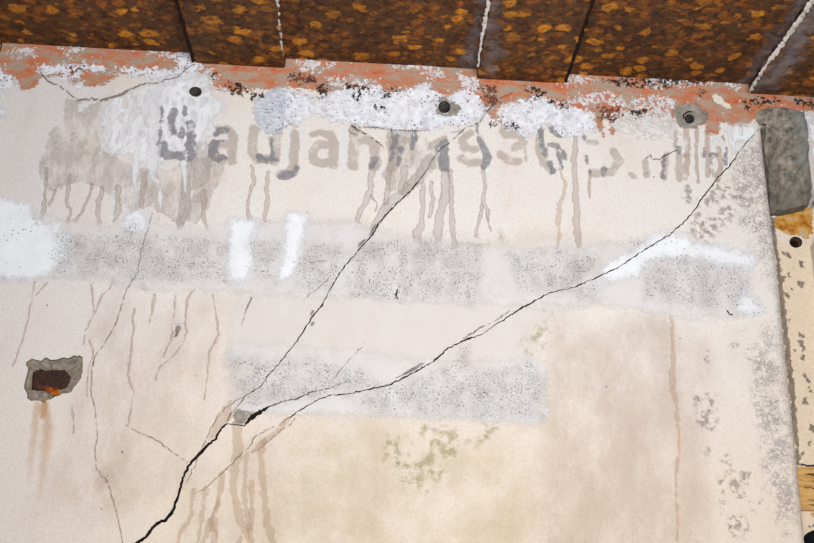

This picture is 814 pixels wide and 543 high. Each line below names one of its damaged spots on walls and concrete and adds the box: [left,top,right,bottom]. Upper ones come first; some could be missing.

leakage [40,160,139,233]
leakage [73,71,226,281]
leakage [349,154,476,299]
leakage [474,168,492,238]
corrosion [775,207,813,239]
crack [90,92,759,543]
flaking render [24,355,83,403]